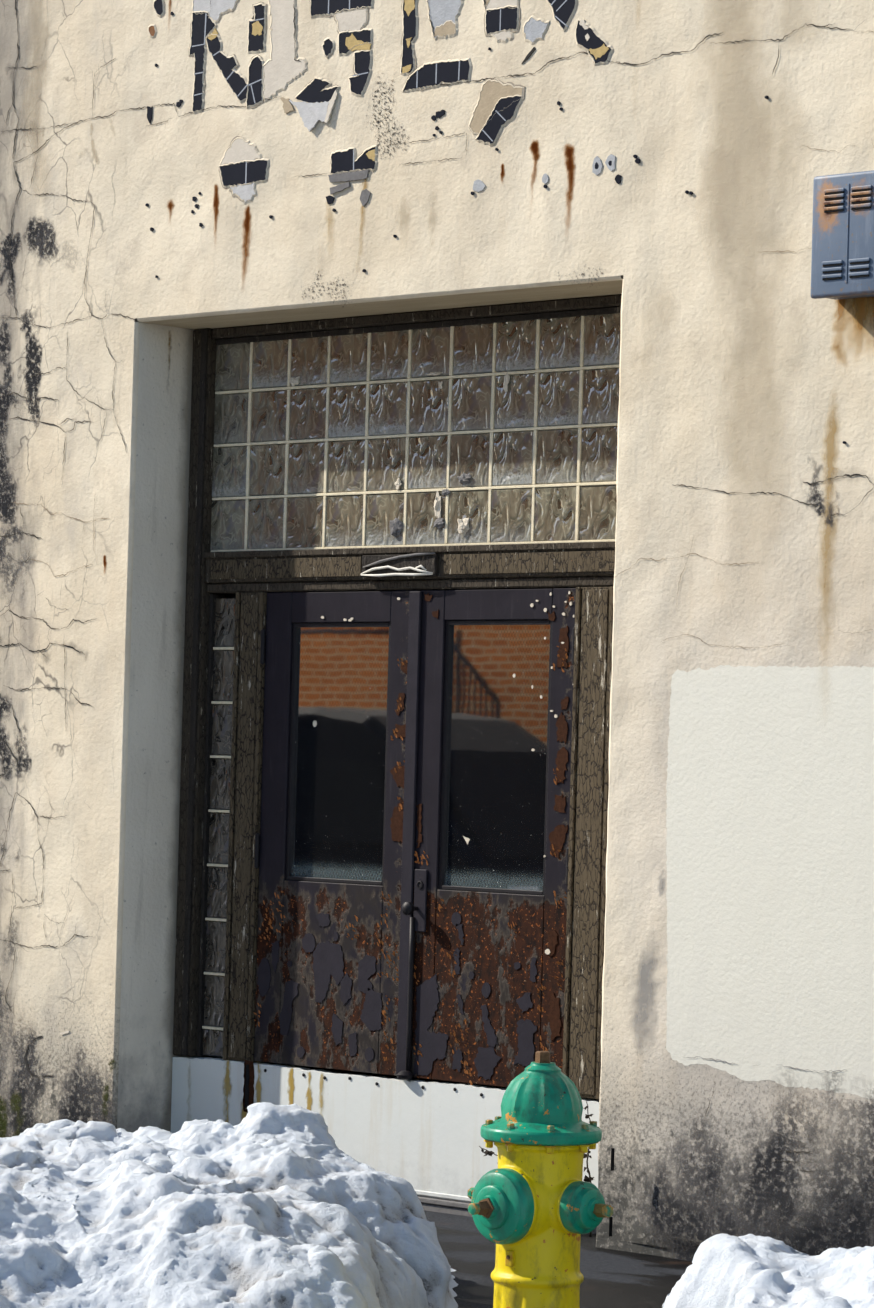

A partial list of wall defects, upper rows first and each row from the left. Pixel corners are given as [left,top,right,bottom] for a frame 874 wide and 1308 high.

peeling [263,0,308,113]
peeling [334,6,369,34]
peeling [482,0,550,64]
crack [414,22,873,89]
water stain [0,218,59,297]
rust [243,206,251,271]
rust [837,297,874,332]
water stain [0,312,42,585]
crack [0,0,280,1014]
crack [674,474,874,516]
rust [243,1060,255,1113]
water stain [642,1099,874,1261]